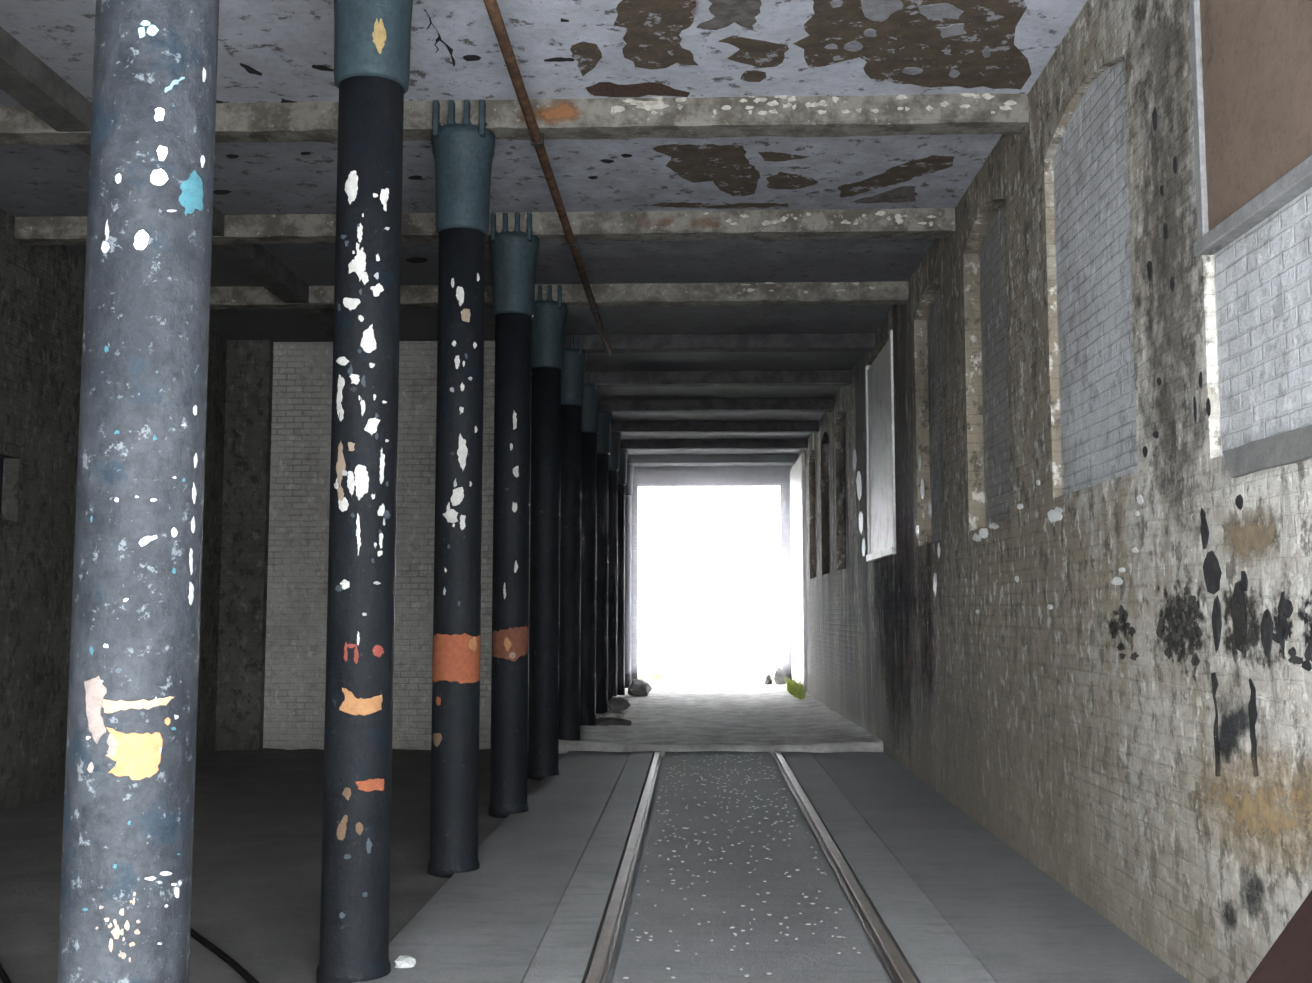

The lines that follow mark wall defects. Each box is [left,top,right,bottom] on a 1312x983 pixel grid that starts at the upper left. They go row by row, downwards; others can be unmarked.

peeling [544,0,1032,115]
peeling [649,144,819,226]
peeling [837,155,955,226]
peeling [451,278,471,322]
peeling [334,170,391,563]
peeling [450,340,477,414]
peeling [443,426,478,530]
water stain [1200,508,1273,661]
peeling [84,668,179,780]
peeling [339,687,383,716]
peeling [432,626,528,706]
peeling [336,778,384,859]